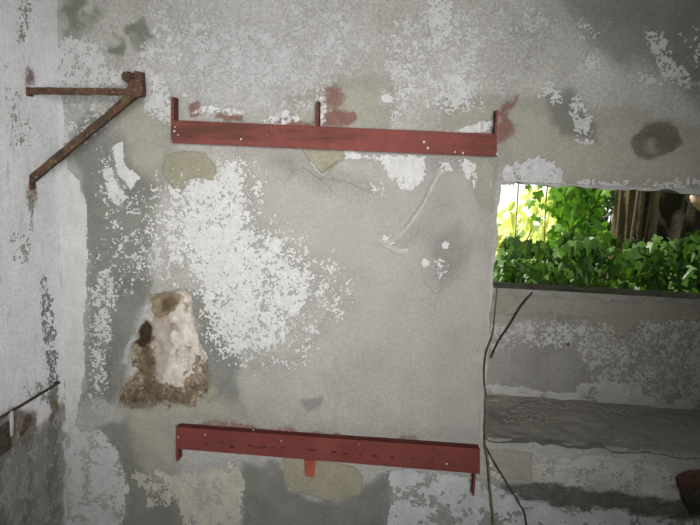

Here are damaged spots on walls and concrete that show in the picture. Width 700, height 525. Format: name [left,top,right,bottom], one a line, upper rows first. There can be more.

peeling [636,26,700,100]
water stain [632,122,681,159]
spalling [502,156,566,184]
spalling [576,176,700,189]
peeling [0,142,354,525]
peeling [486,313,700,410]
peeling [387,469,676,525]